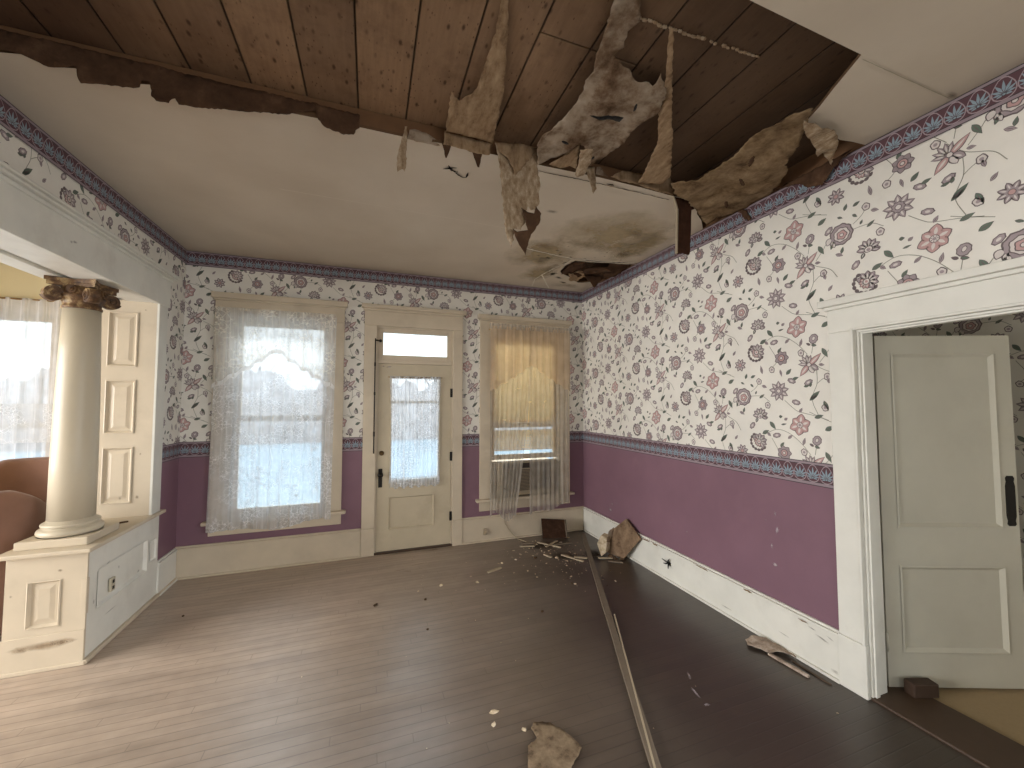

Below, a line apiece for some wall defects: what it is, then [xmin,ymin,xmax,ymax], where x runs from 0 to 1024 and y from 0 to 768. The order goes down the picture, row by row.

peeling [407,129,440,146]
peeling [558,259,636,288]